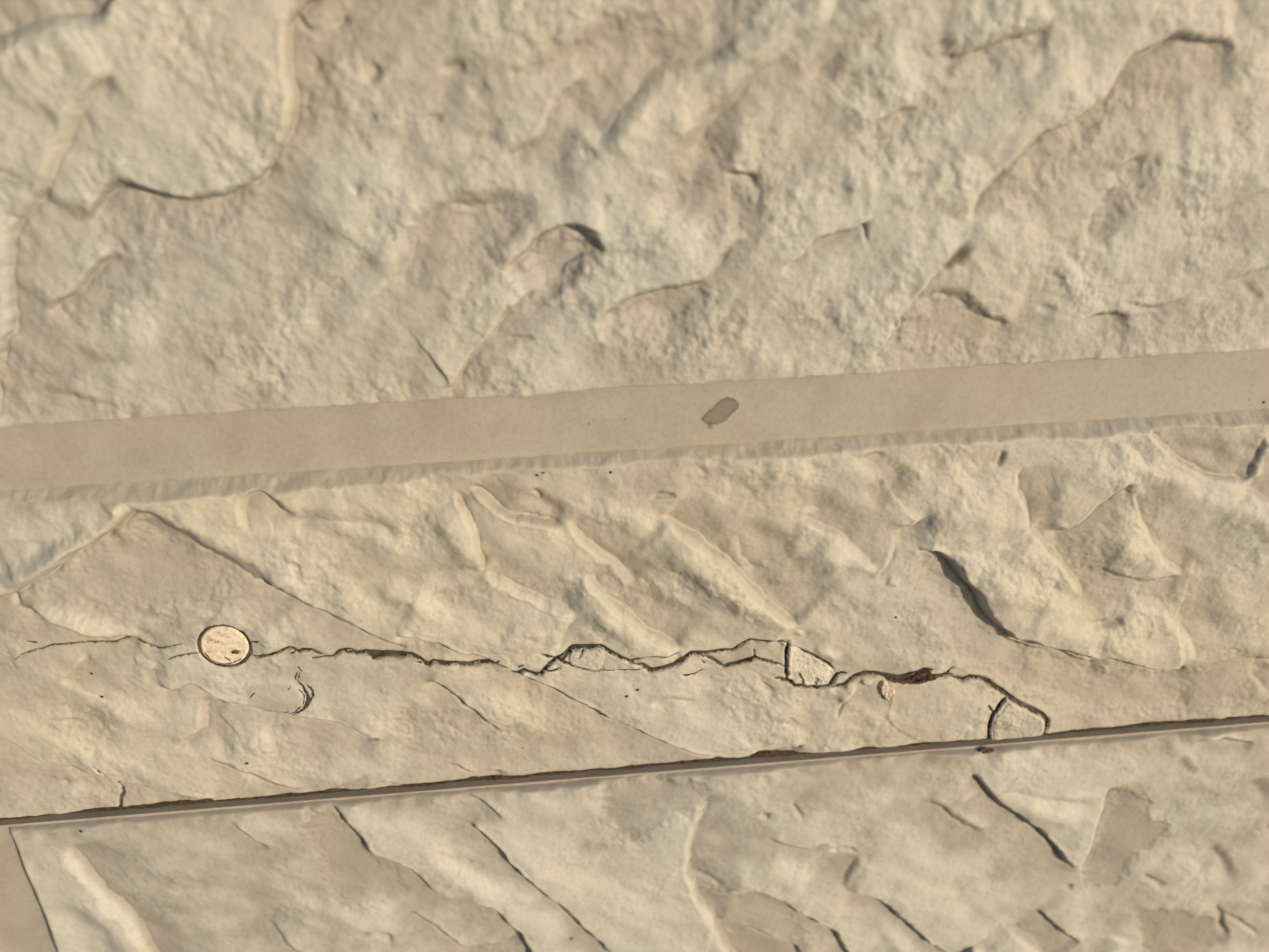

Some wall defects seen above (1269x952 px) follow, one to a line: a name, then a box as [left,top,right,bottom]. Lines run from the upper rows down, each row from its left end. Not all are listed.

crack [14,636,196,661]
crack [251,638,1048,738]